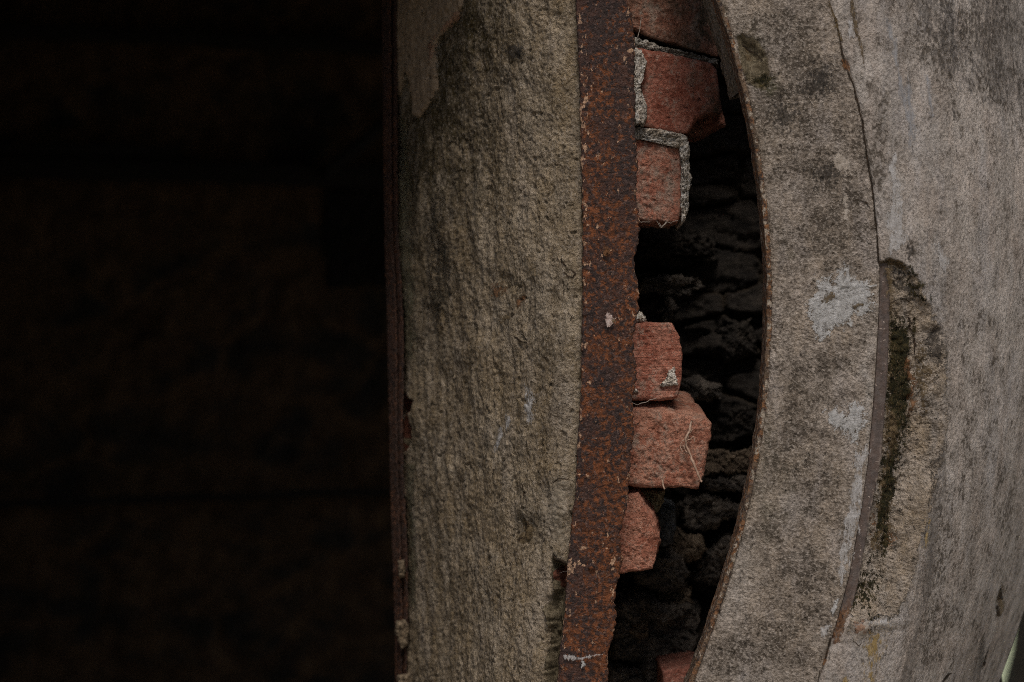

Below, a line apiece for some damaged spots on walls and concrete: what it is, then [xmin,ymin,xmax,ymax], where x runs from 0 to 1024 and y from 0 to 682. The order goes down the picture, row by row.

spalling [687,111,726,143]
crack [836,0,880,264]